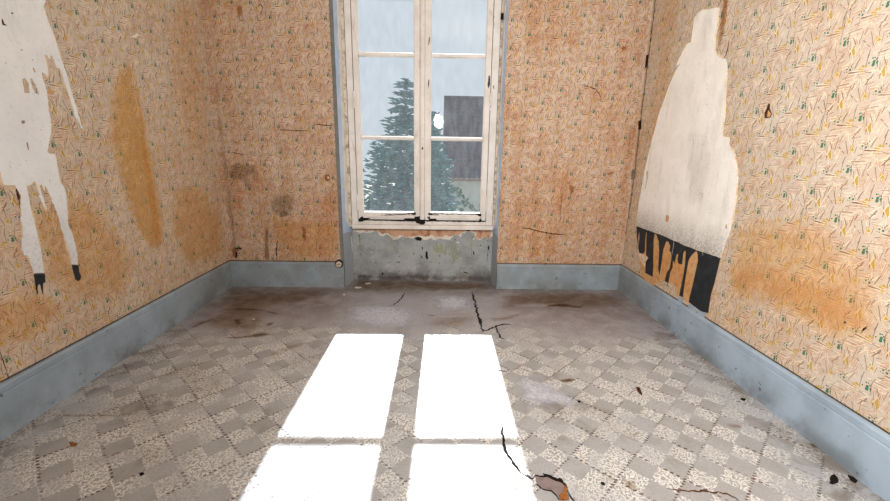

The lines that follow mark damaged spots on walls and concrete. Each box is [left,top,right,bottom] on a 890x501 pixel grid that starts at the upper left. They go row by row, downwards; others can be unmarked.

flaking render [337,0,506,259]
peeling [638,253,655,286]
crack [463,291,511,366]